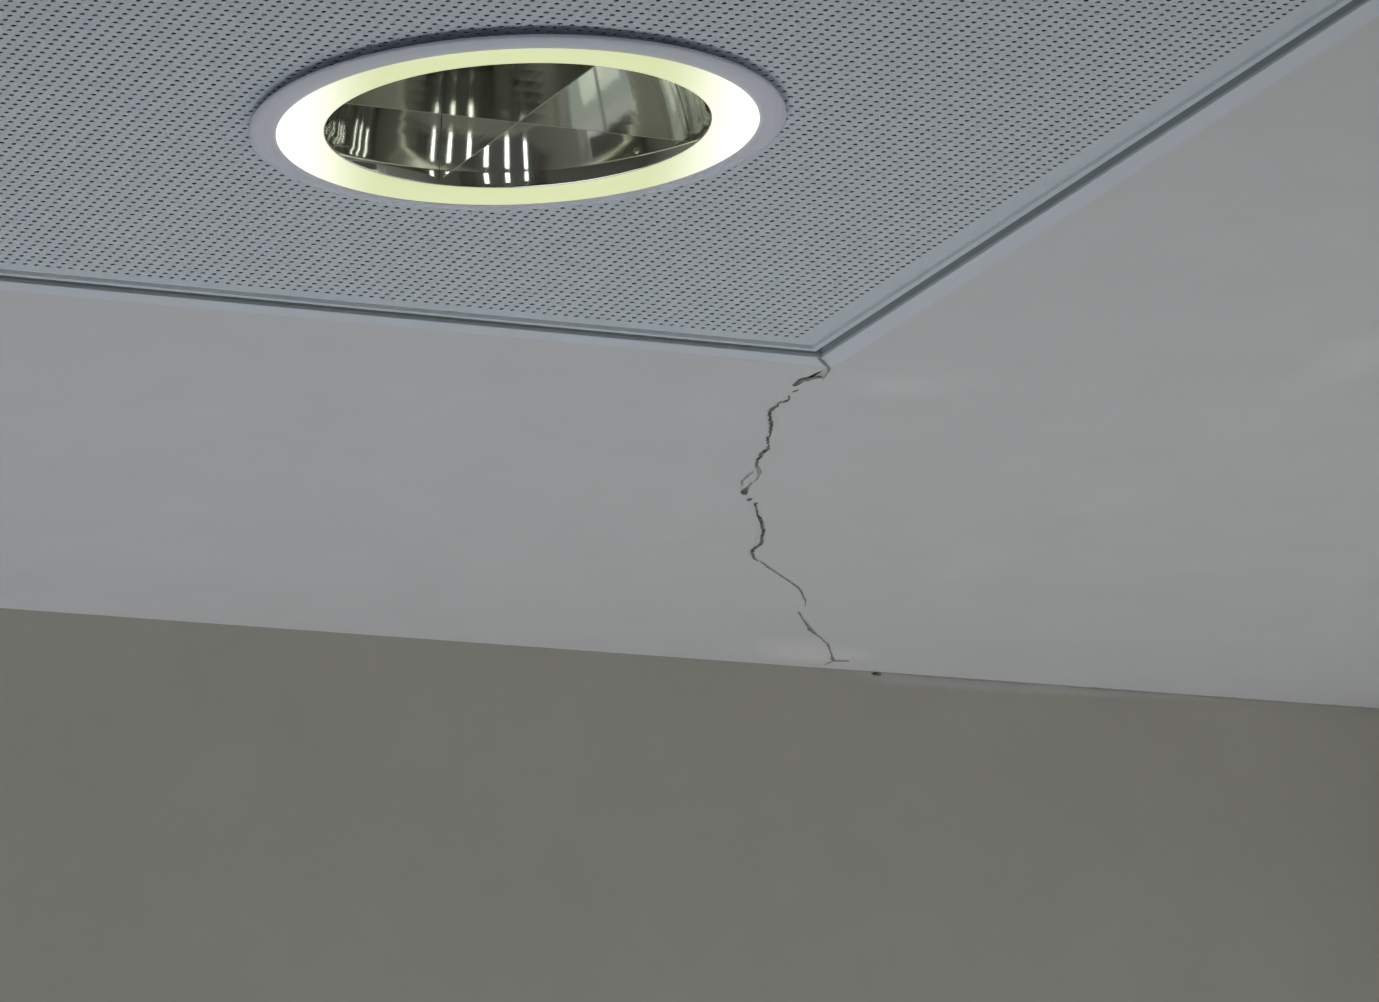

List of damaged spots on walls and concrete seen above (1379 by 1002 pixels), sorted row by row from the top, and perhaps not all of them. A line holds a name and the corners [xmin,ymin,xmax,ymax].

crack [741,358,849,665]